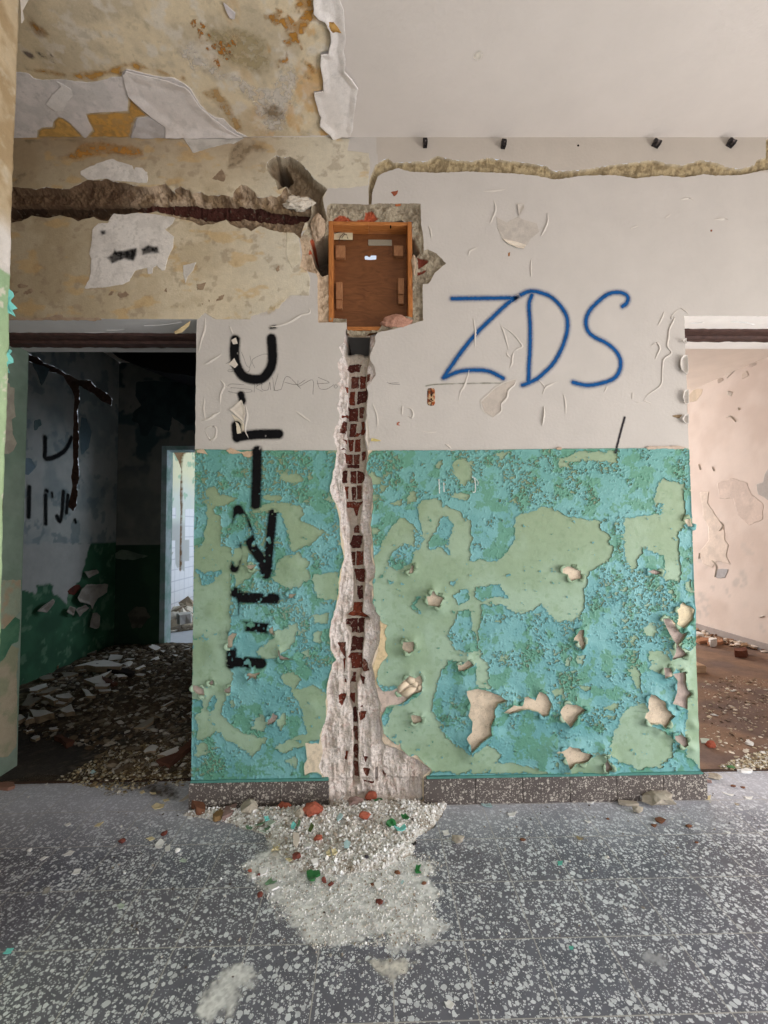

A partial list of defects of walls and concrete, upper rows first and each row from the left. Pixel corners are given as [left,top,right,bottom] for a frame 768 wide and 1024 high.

flaking render [7,0,446,337]
peeling [496,203,539,249]
peeling [38,599,55,613]
peeling [67,569,108,629]
peeling [156,448,344,780]
crack [319,328,430,802]
peeling [366,446,768,776]